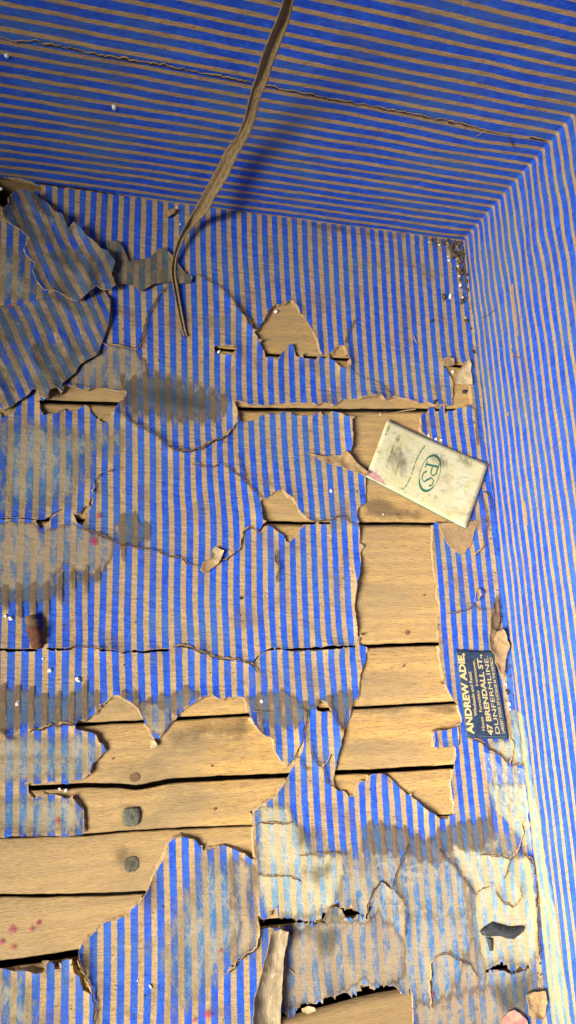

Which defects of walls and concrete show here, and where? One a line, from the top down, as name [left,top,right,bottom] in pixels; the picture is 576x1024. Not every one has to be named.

crack [0,36,545,149]
peeling [254,299,352,369]
peeling [235,385,473,440]
crack [80,523,258,566]
peeling [254,486,369,665]
crack [173,643,257,672]
peeling [430,524,462,818]
peeling [333,773,418,801]
peeling [7,694,304,996]
peeling [500,990,548,1024]